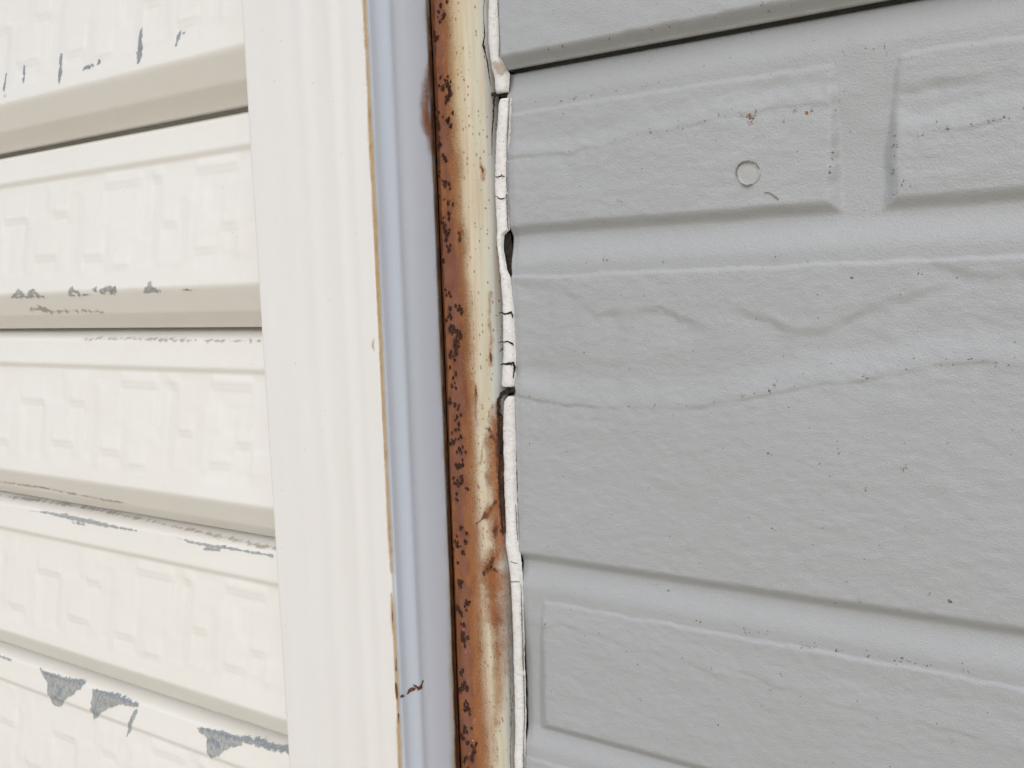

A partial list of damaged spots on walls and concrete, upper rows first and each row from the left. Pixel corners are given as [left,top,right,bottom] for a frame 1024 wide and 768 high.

peeling [11,289,45,299]
peeling [68,285,117,298]
rust [419,0,513,768]
peeling [28,510,137,532]
peeling [178,538,274,558]
crack [496,311,525,768]
peeling [39,668,139,737]
peeling [197,726,289,758]